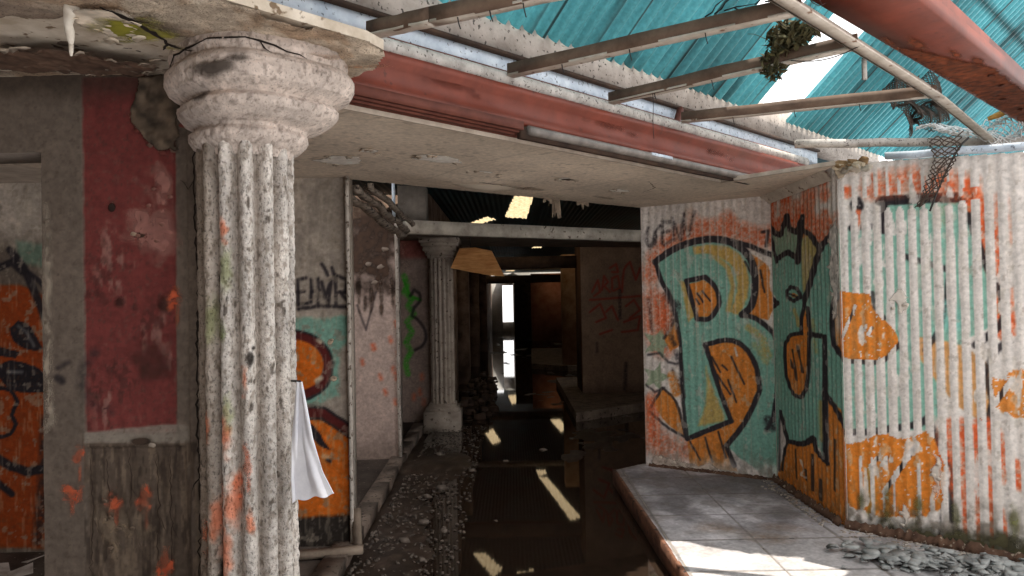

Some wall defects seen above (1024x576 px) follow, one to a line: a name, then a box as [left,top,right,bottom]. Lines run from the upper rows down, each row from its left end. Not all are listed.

flaking render [72,9,146,45]
crack [99,7,307,67]
rust [882,38,1024,123]
water stain [353,194,403,315]